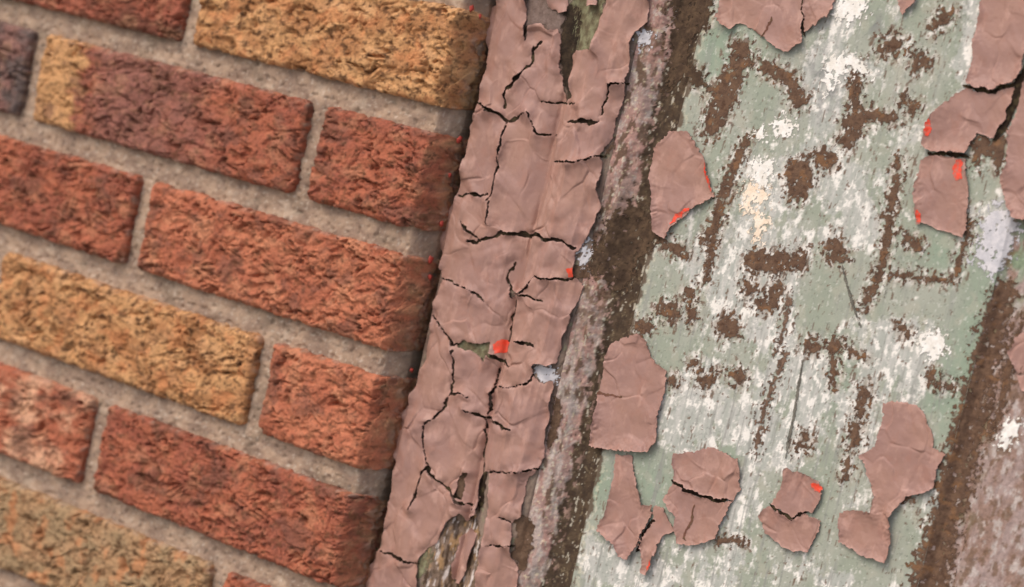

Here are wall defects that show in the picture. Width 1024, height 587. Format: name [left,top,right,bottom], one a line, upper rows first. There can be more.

crack [459,25,630,250]
peeling [525,0,605,101]
peeling [648,131,715,239]
peeling [714,0,873,52]
crack [927,150,969,158]
peeling [912,0,1024,283]
crack [962,67,1024,142]
crack [412,262,575,548]
peeling [589,334,742,575]
crack [671,479,728,541]
crack [769,503,807,521]
peeling [837,401,946,563]